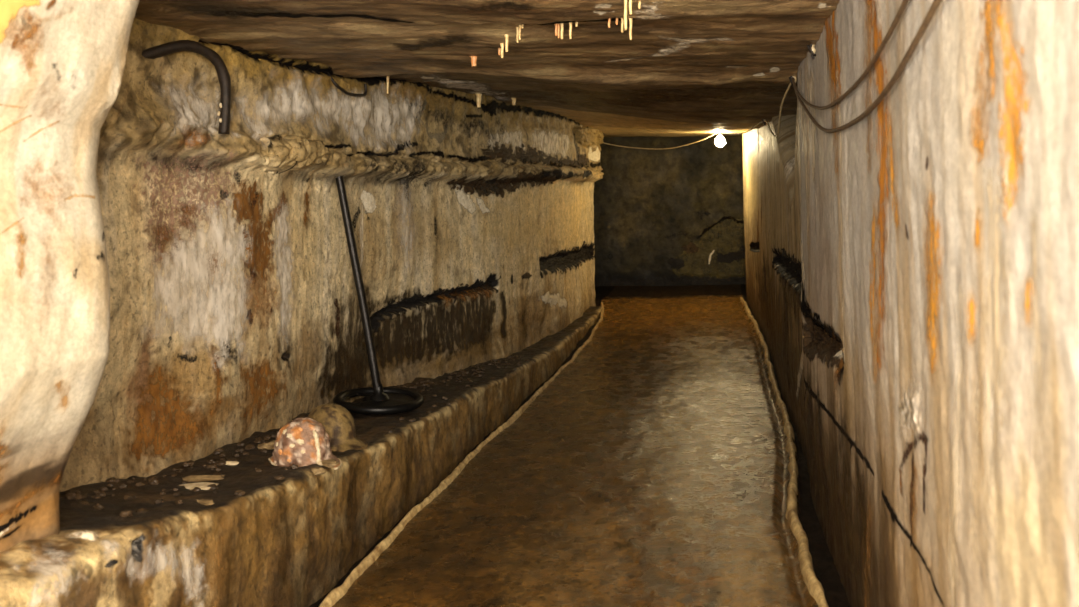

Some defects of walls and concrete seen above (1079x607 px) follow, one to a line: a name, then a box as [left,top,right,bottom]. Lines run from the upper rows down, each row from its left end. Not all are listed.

spalling [369,241,594,334]
corrosion [825,11,841,173]
corrosion [865,0,898,363]
corrosion [925,196,940,373]
corrosion [973,0,1027,217]
crack [804,377,944,607]